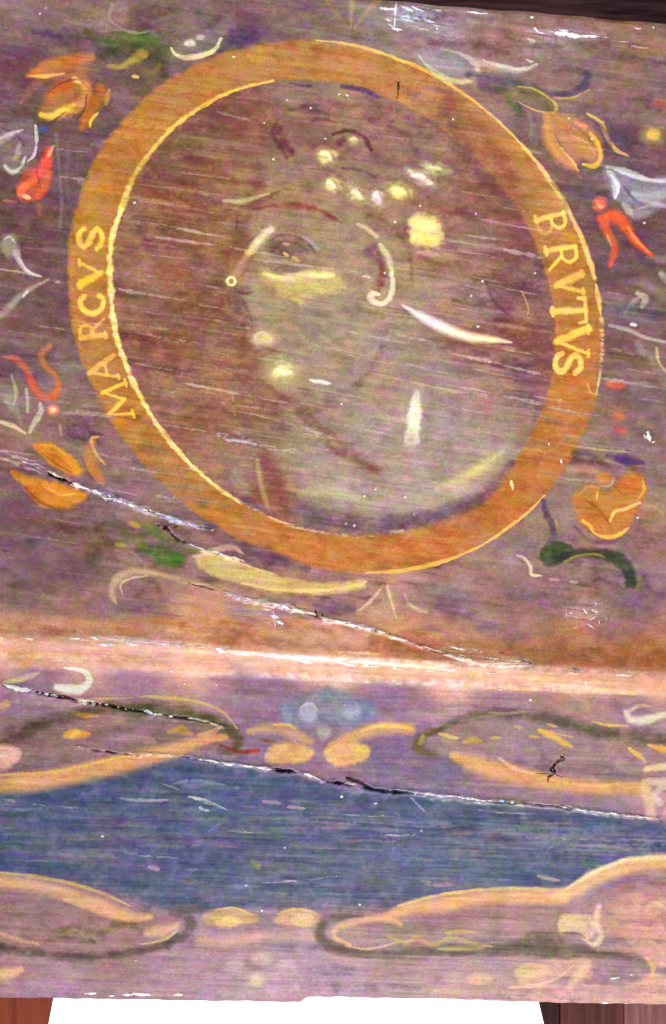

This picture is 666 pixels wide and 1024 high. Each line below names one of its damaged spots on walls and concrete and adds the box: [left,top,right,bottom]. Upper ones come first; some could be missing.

crack [0,449,244,561]
crack [187,582,472,660]
crack [1,683,224,727]
crack [75,745,658,819]